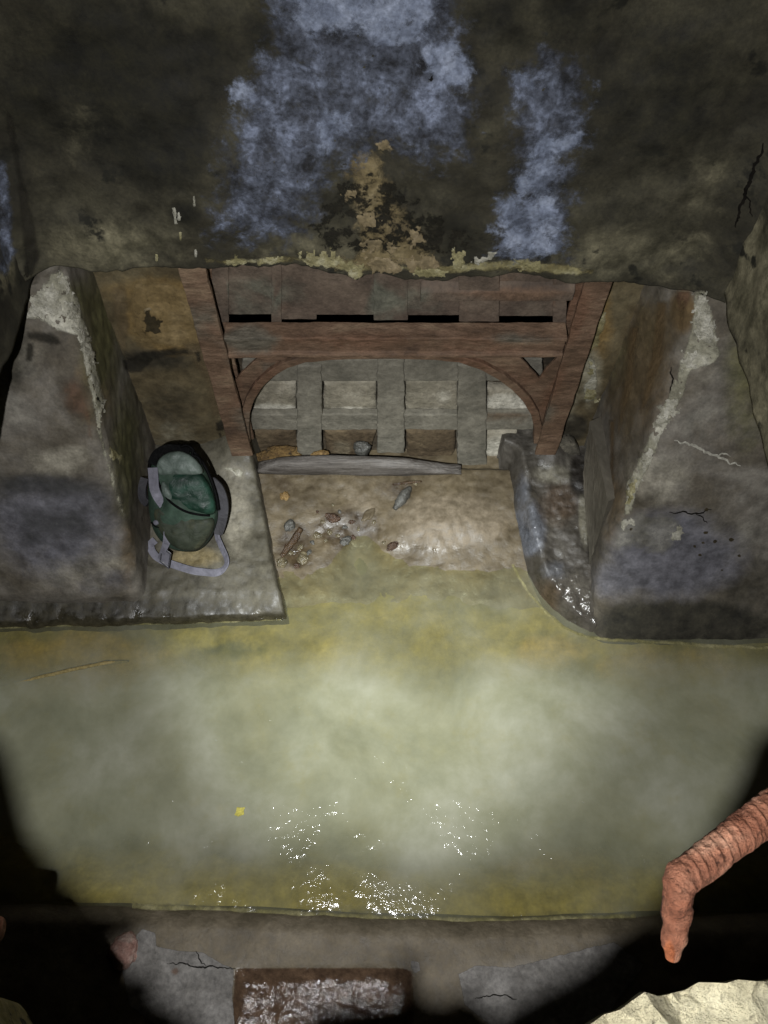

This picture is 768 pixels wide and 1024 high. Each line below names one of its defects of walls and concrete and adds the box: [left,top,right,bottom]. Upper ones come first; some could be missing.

leakage [215,0,583,265]
peeling [207,139,592,279]
crack [734,143,764,228]
crack [670,509,712,522]
crack [167,952,235,969]